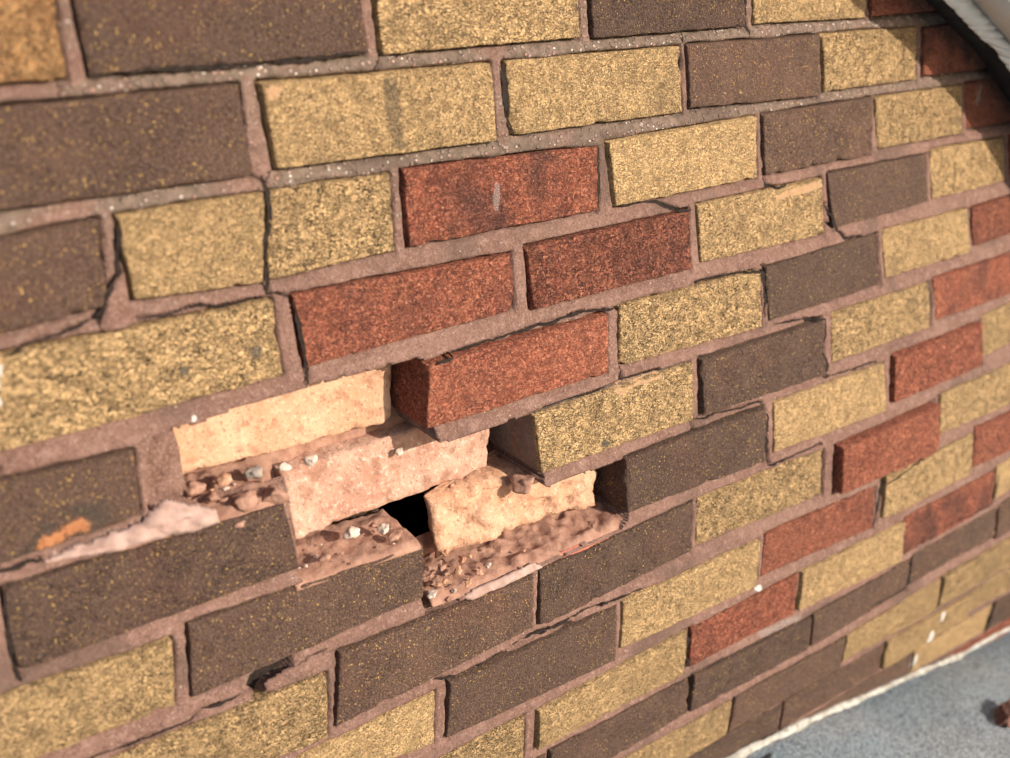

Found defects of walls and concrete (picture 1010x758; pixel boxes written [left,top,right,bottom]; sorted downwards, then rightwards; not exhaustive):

crack [7,221,123,356]
crack [139,168,309,388]
spalling [173,363,597,558]
crack [0,559,43,682]
spalling [462,562,543,600]
spalling [560,536,608,558]